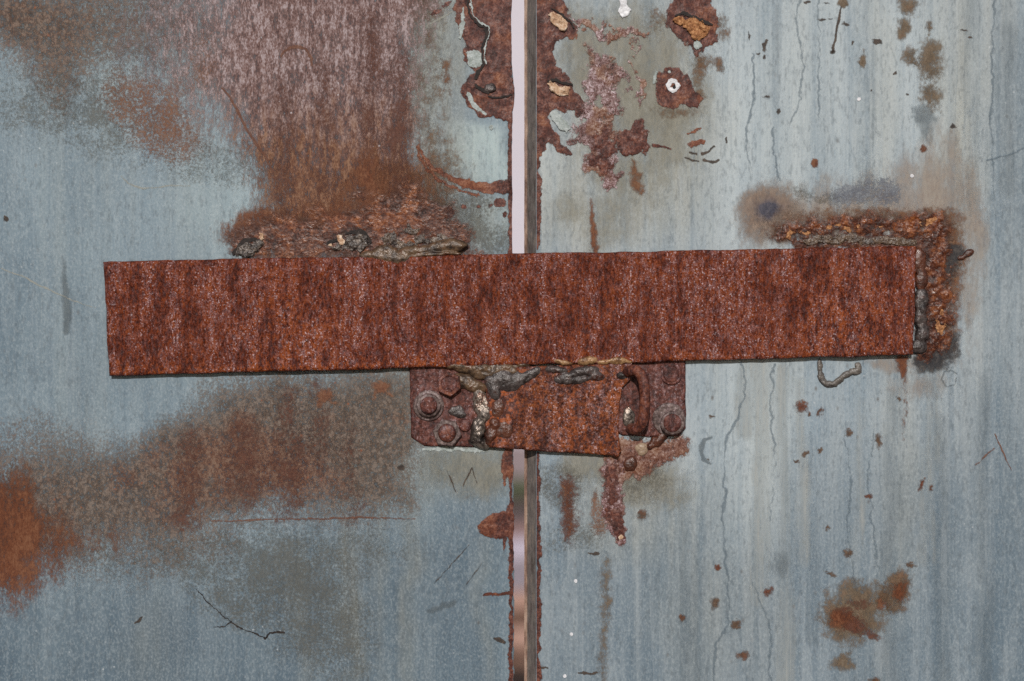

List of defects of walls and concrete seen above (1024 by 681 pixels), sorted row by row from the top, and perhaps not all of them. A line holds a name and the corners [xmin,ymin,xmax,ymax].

rust [0,0,513,259]
rust [566,16,705,195]
rust [590,202,599,253]
rust [0,368,424,605]
rust [501,448,514,503]
crack [196,589,285,640]
rust [483,548,514,681]
rust [537,434,690,681]
rust [823,562,914,670]